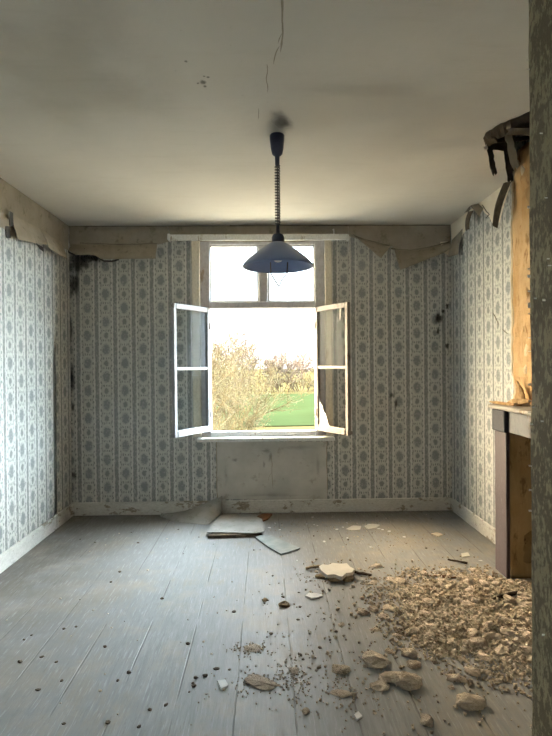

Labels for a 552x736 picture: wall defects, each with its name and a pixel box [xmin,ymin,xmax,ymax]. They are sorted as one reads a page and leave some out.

crack [266,0,284,92]
spalling [483,111,530,151]
damp [69,255,100,294]
spalling [0,141,546,414]